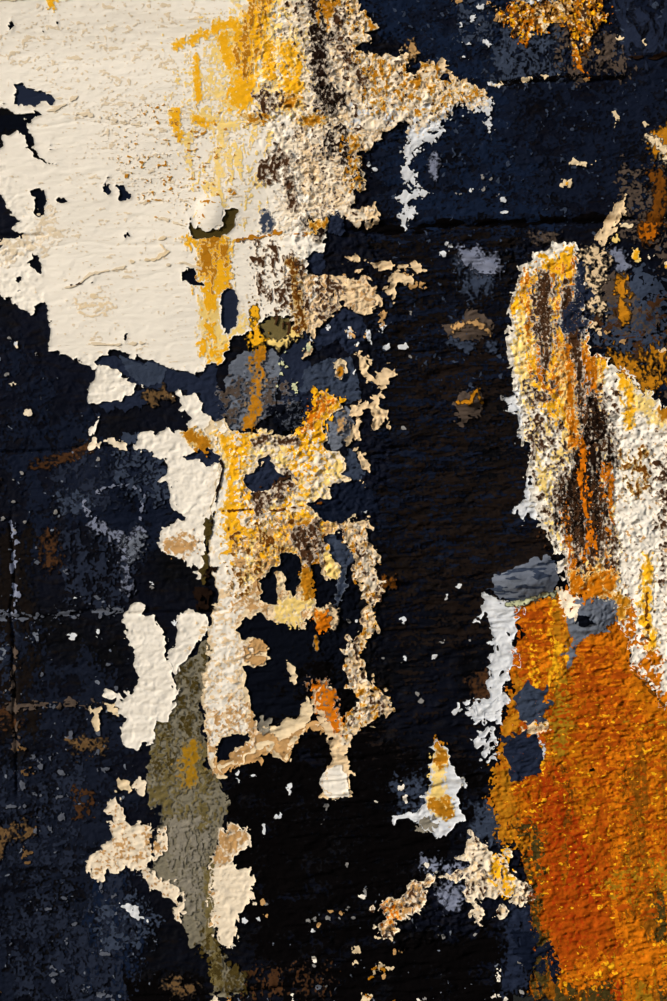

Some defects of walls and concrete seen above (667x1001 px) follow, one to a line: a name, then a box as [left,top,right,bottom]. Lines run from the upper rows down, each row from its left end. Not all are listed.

peeling [0,83,55,164]
peeling [30,188,68,217]
peeling [103,177,131,201]
spalling [189,208,239,239]
peeling [27,254,42,274]
peeling [182,267,205,286]
peeling [307,251,326,275]
peeling [220,288,239,334]
peeling [589,270,667,372]
spalling [575,615,594,627]
peeling [94,308,380,999]
peeling [500,680,554,782]